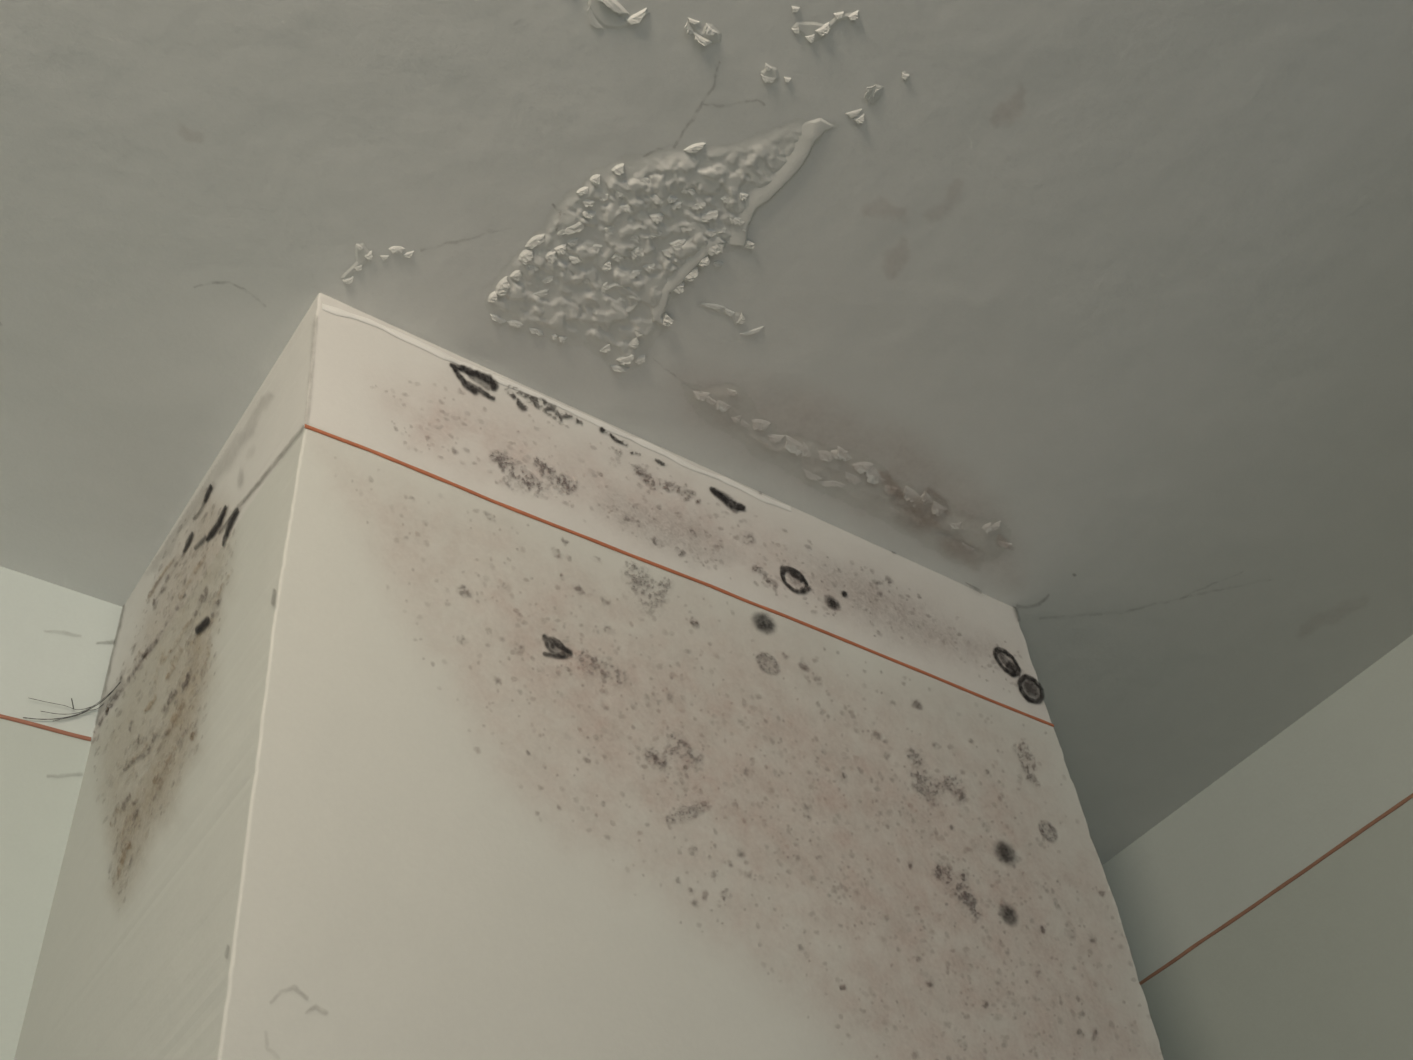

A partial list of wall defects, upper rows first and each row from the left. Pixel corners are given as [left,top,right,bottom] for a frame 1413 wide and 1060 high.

peeling [587,0,651,30]
peeling [685,18,722,46]
peeling [790,6,859,44]
leakage [450,363,582,423]
leakage [637,459,745,511]
leakage [183,505,239,565]
leakage [780,566,810,593]
leakage [195,599,219,634]
leakage [756,614,774,630]
leakage [827,591,847,608]
leakage [542,634,593,660]
leakage [993,647,1044,703]